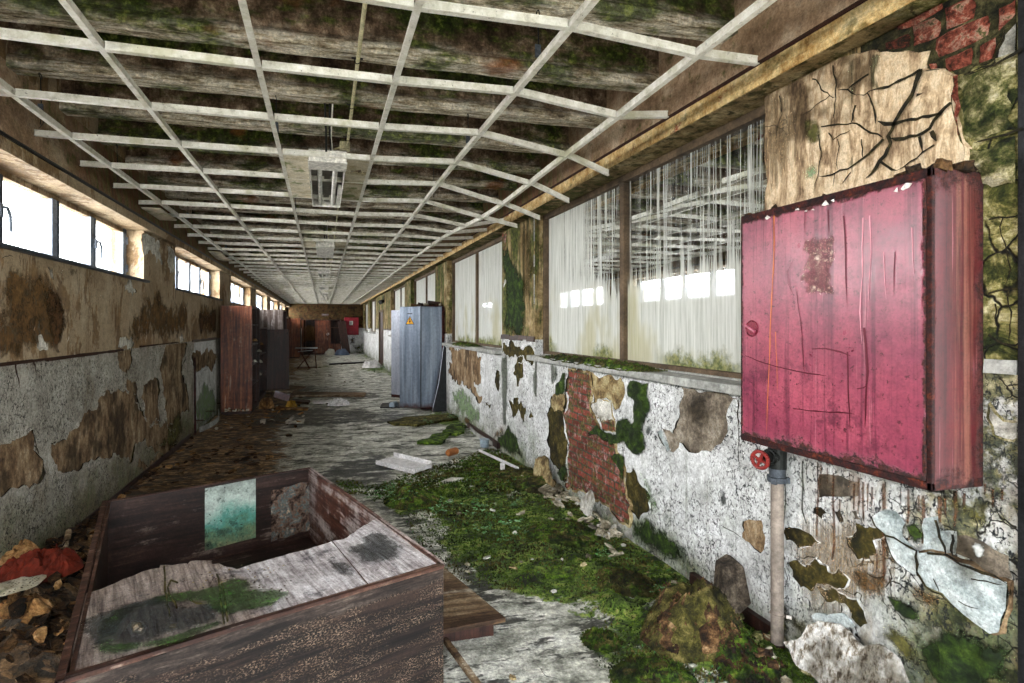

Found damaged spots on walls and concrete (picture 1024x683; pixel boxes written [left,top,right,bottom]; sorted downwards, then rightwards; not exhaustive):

crack [765,65,952,192]
peeling [34,325,49,353]
peeling [447,347,491,409]
peeling [0,333,217,500]
flaking render [495,340,652,528]
peeling [657,386,741,456]
rust [816,462,840,560]
rust [849,473,886,520]
rust [875,533,886,580]